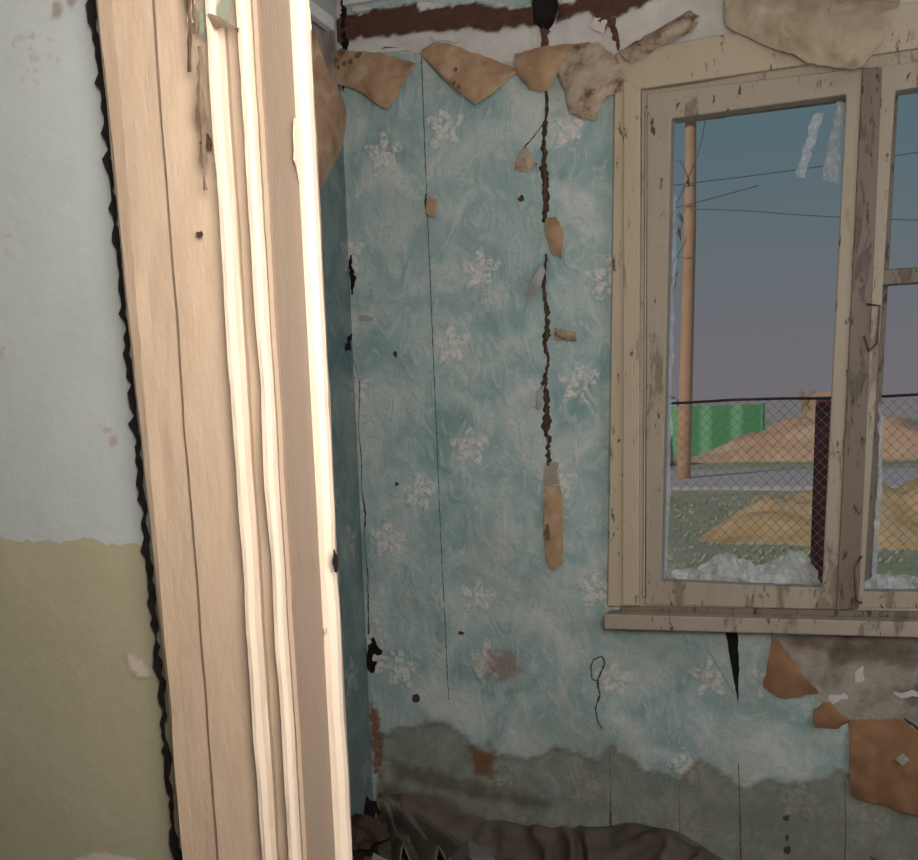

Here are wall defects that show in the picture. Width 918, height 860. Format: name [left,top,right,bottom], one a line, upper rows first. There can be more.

flaking render [309,2,535,87]
flaking render [556,0,649,50]
peeling [185,0,240,190]
crack [523,91,550,223]
crack [348,255,356,295]
crack [536,254,552,466]
crack [345,334,370,634]
peeling [126,653,151,678]
flaking render [770,634,918,729]